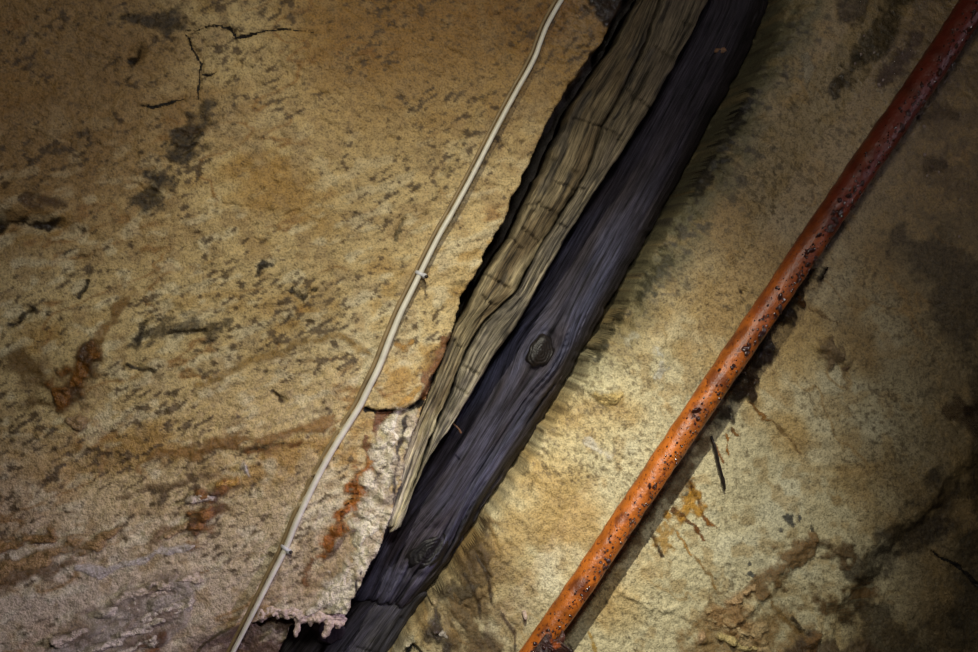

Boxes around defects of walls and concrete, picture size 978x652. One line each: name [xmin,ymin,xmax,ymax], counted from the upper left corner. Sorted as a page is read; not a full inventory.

crack [141,24,314,109]
rust [194,333,370,387]
rust [144,414,336,548]
flaking render [306,406,418,616]
rust [302,333,452,586]
damp [812,371,978,652]
damp [679,584,812,652]